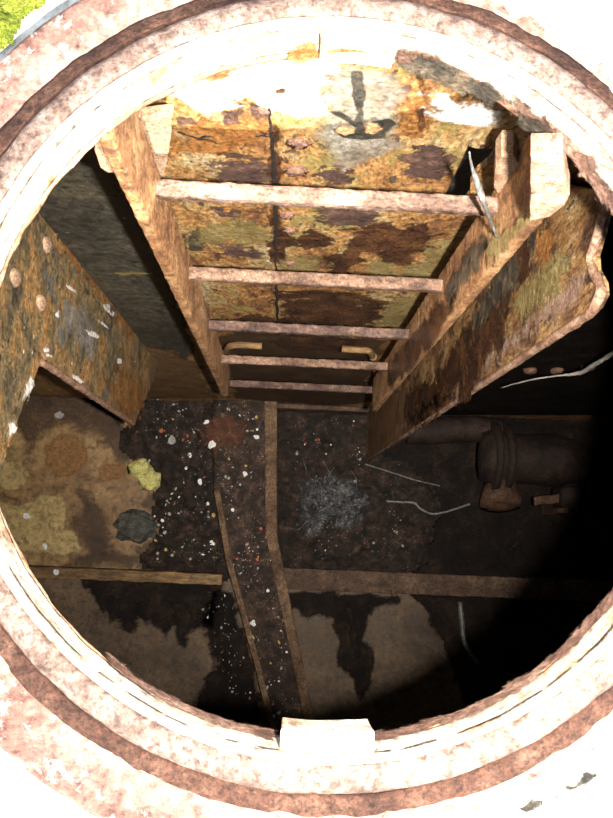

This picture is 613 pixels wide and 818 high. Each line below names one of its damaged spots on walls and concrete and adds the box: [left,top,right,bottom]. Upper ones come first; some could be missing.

corrosion [169,104,284,186]
corrosion [288,41,613,215]
corrosion [210,205,444,276]
corrosion [220,290,390,328]
corrosion [263,333,361,352]
corrosion [367,218,585,461]
leakage [289,591,401,700]